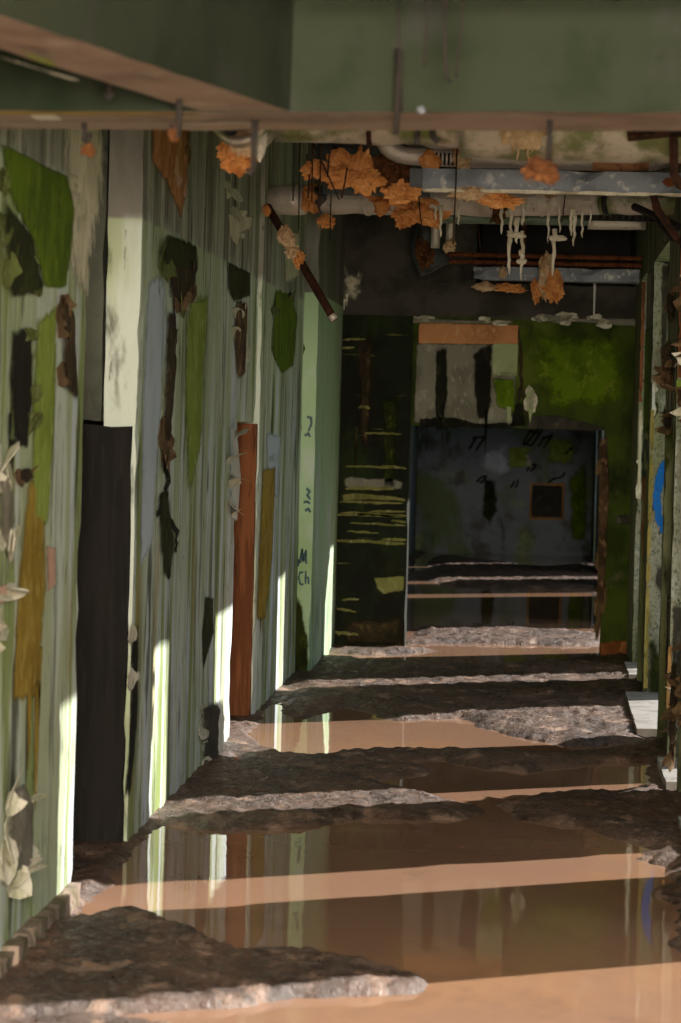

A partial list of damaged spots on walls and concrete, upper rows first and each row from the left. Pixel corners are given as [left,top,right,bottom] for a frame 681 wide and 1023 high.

flaking render [0,166,44,297]
flaking render [55,294,78,398]
flaking render [663,275,681,323]
flaking render [636,338,681,499]
flaking render [0,441,40,652]
leakage [420,345,610,640]
flaking render [659,643,681,772]